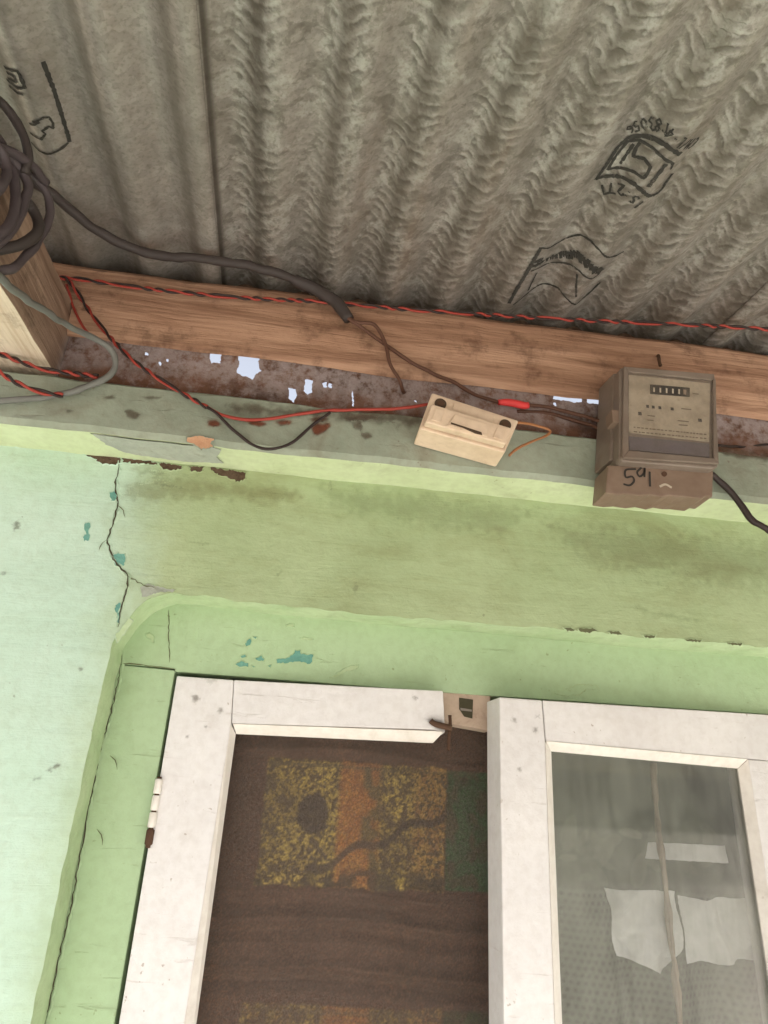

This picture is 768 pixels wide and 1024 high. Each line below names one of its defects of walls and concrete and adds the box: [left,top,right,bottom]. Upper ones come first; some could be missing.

rust [58,336,598,439]
peeling [83,433,250,483]
rust [716,414,768,456]
peeling [234,636,314,669]
crack [45,460,174,1024]